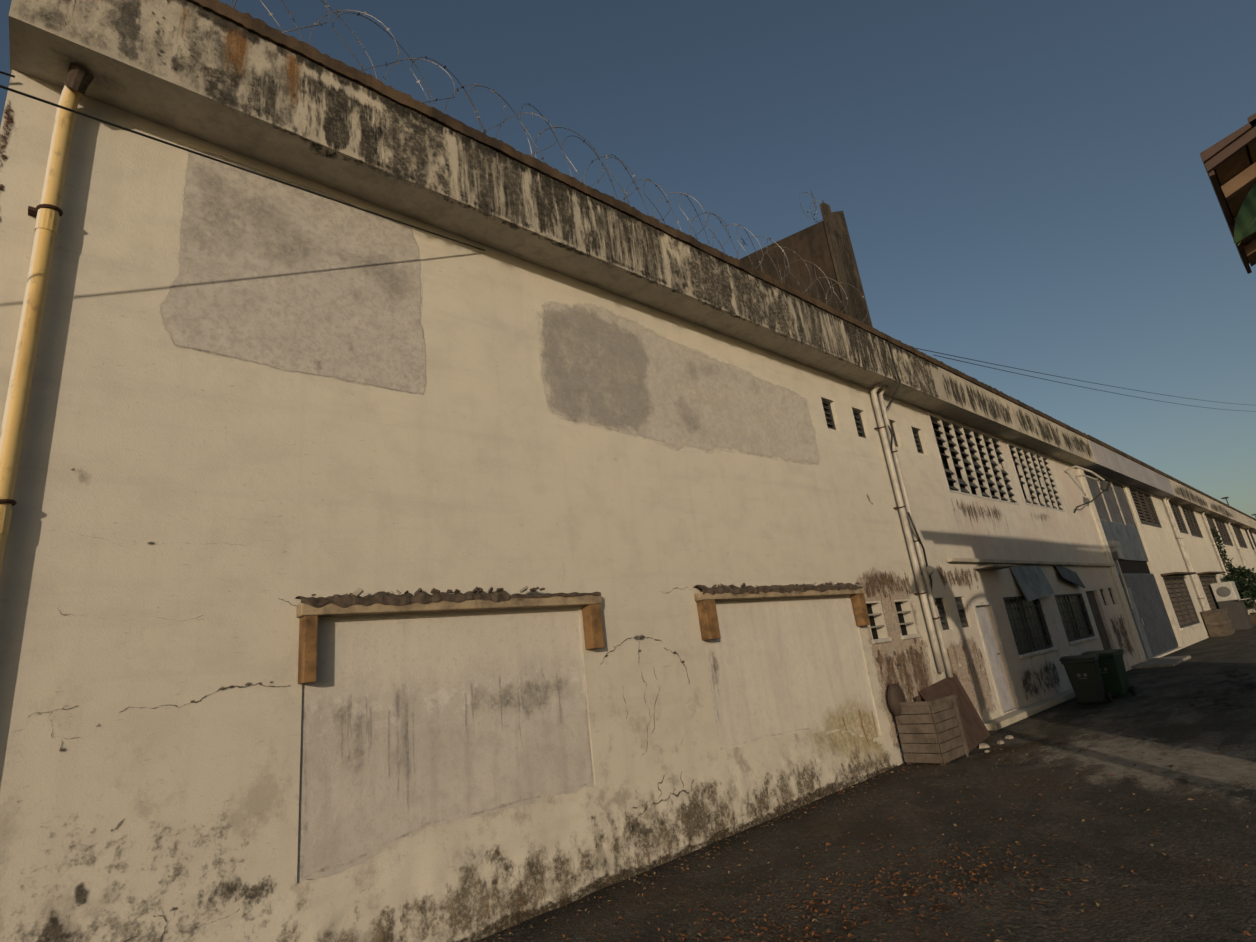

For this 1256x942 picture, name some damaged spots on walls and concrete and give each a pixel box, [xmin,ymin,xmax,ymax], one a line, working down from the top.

flaking render [0,101,14,165]
damp [107,0,1093,458]
crack [28,681,290,751]
crack [604,635,690,745]
peeling [694,569,939,746]
peeling [946,638,995,714]
damp [372,712,897,942]
crack [631,773,694,836]
damp [17,900,161,942]
damp [199,858,273,919]